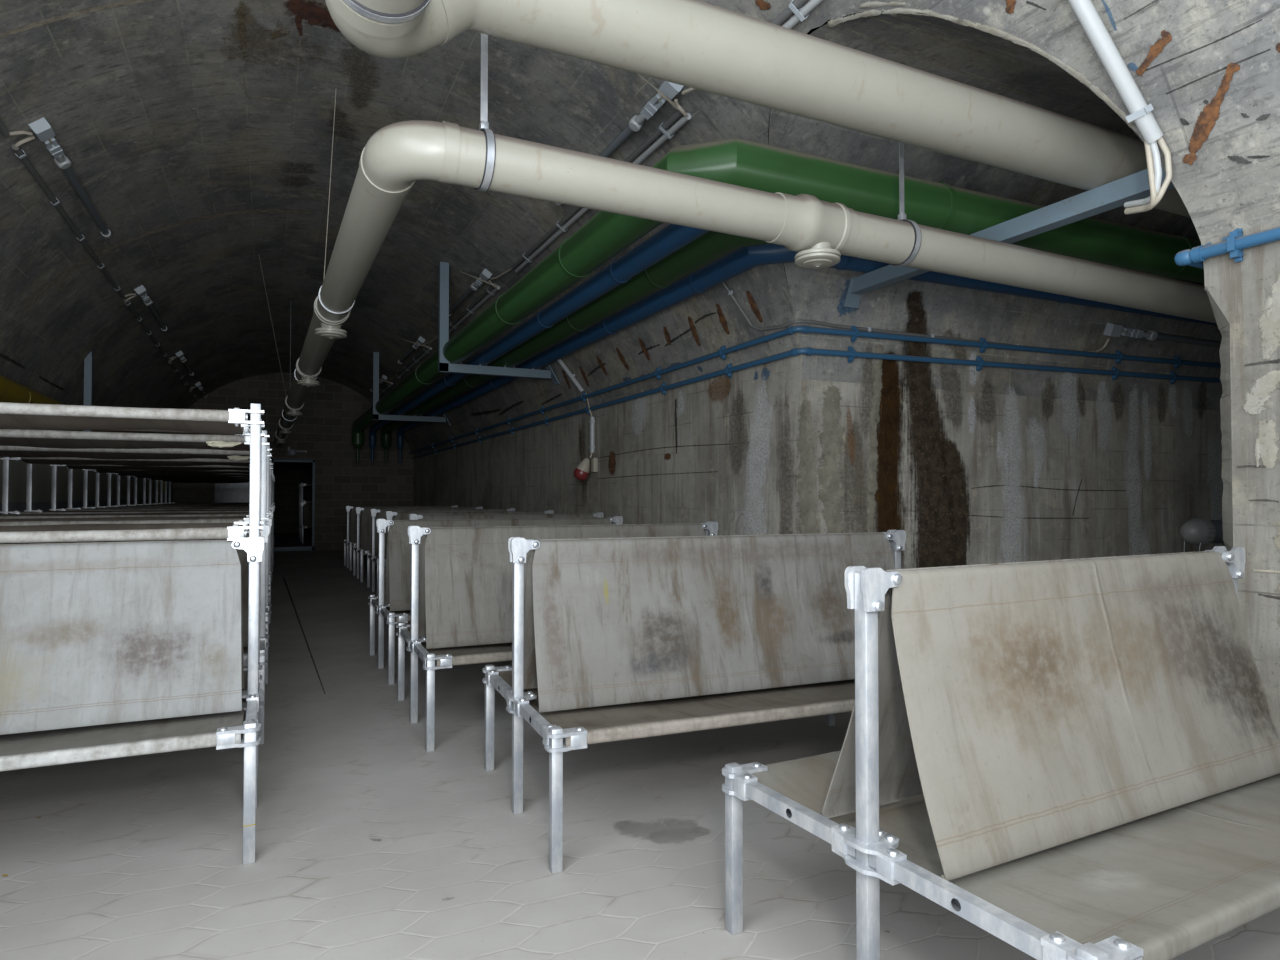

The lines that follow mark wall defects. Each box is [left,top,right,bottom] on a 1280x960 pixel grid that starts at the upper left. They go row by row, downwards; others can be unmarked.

corrosion [283,0,341,36]
corrosion [1005,0,1016,14]
corrosion [1136,30,1172,76]
corrosion [1183,62,1240,165]
corrosion [716,303,730,334]
peeling [1243,274,1280,469]
leakage [842,291,1206,569]
leakage [1208,439,1223,520]
leakage [616,820,709,842]